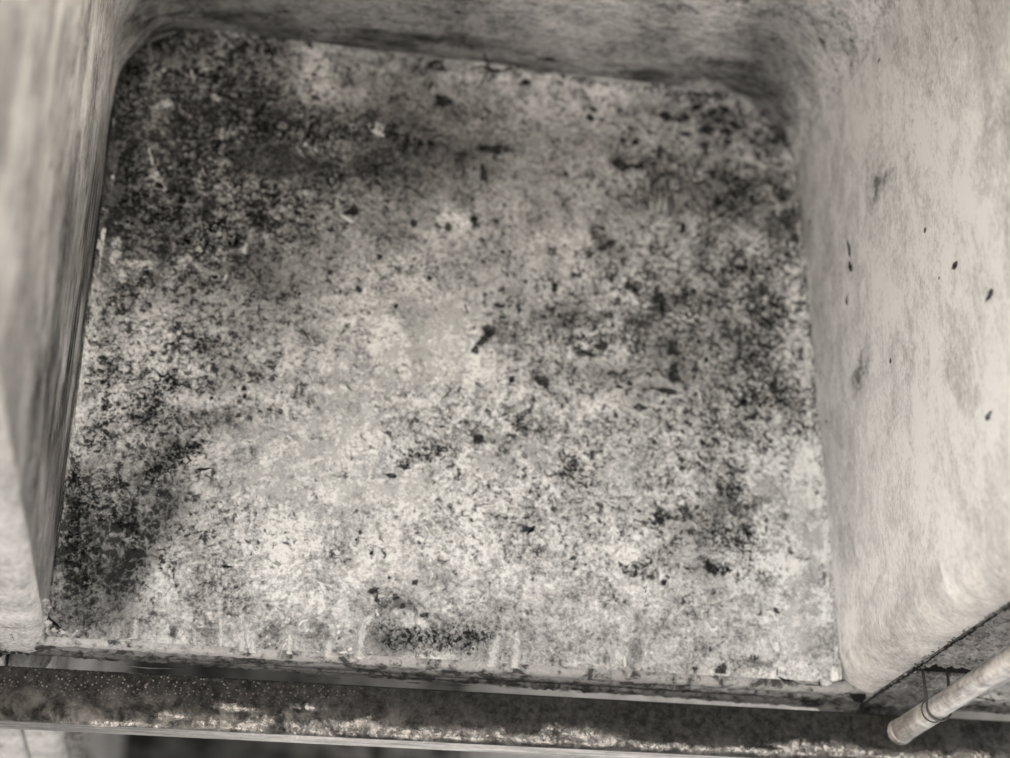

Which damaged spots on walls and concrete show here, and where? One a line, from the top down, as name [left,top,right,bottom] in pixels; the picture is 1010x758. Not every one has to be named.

leakage [476,140,520,184]
leakage [30,29,506,609]
leakage [531,217,617,269]
leakage [548,278,703,395]
leakage [611,113,814,451]